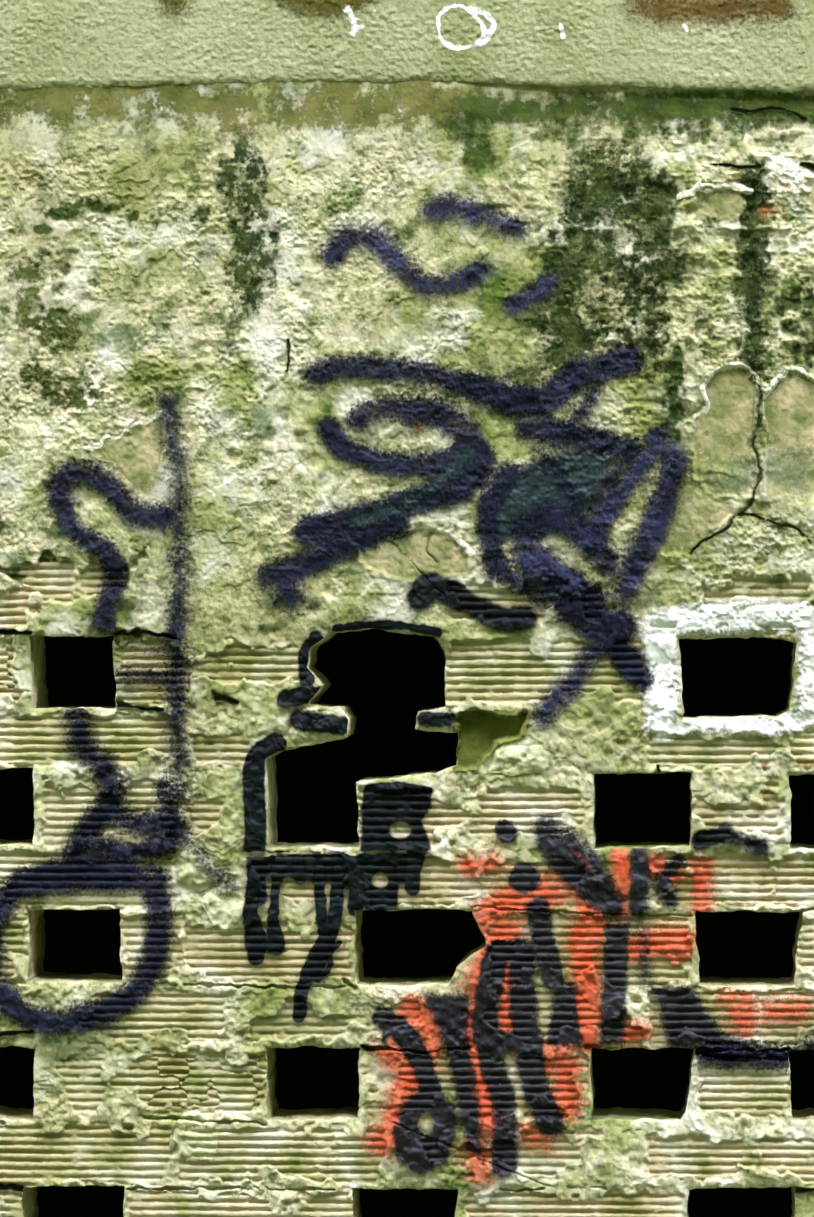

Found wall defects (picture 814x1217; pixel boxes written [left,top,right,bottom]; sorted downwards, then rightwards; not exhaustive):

damp [504,139,688,469]
damp [695,312,720,340]
damp [733,159,814,445]
peeling [358,526,475,583]
crack [690,383,810,555]
spalling [452,709,531,772]